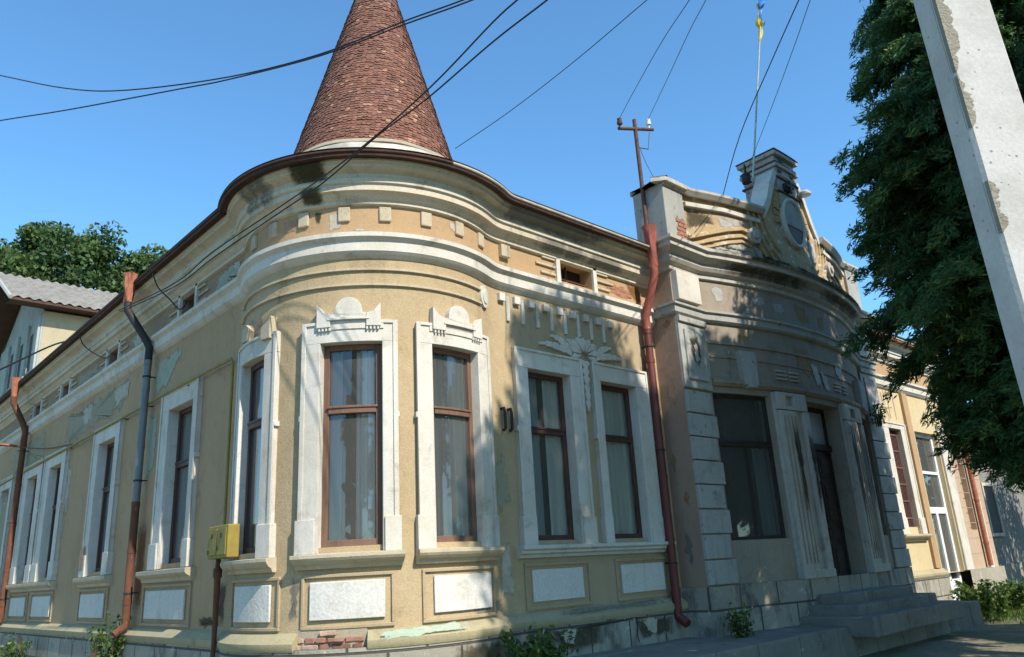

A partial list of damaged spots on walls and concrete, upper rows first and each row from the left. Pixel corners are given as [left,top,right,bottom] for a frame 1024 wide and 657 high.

spalling [676,216,688,239]
flaking render [605,283,632,299]
peeling [155,348,182,394]
peeling [68,378,130,444]
peeling [14,433,46,472]
damp [795,432,822,509]
flaking render [296,627,368,650]